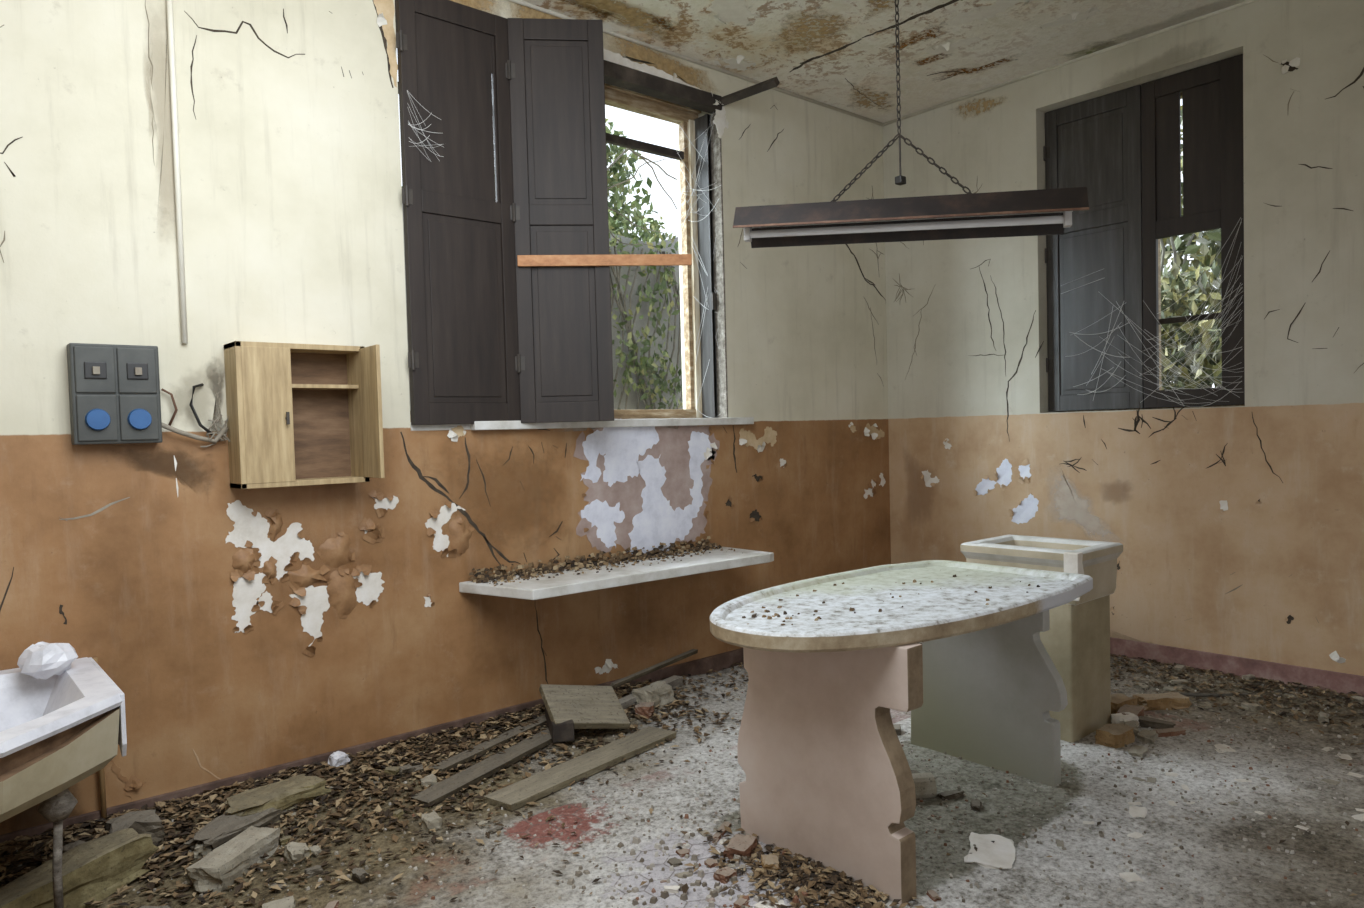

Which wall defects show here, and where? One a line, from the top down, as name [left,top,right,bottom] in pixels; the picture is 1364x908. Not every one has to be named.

crack [184,8,305,118]
peeling [603,48,729,138]
crack [0,137,22,177]
crack [845,241,935,386]
crack [971,259,1044,442]
peeling [225,500,330,657]
peeling [351,564,384,608]
peeling [425,500,465,558]
crack [400,429,567,565]
peeling [573,418,720,555]
peeling [973,458,1039,524]
crack [1207,414,1283,483]